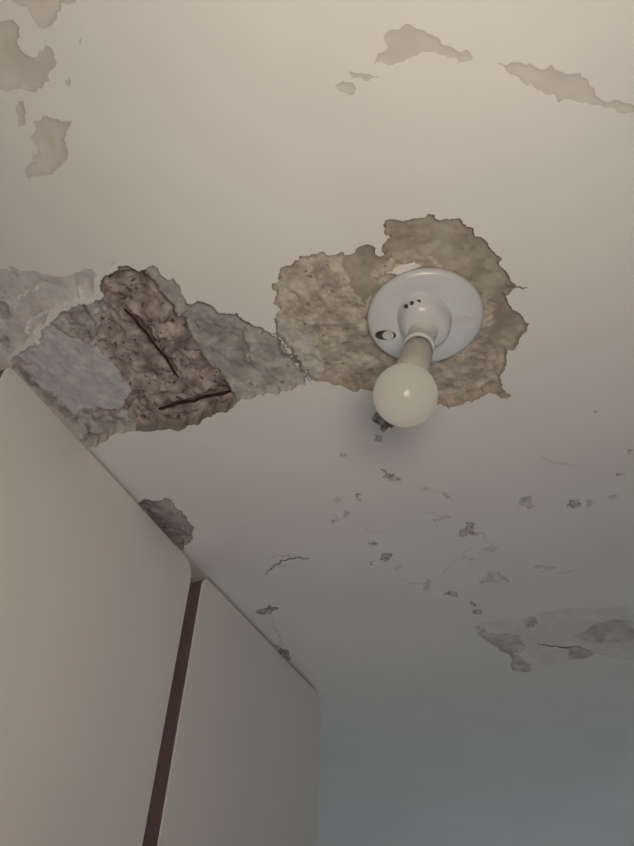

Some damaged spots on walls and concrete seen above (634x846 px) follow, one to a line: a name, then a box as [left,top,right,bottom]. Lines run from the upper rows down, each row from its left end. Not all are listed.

peeling [10,0,76,29]
peeling [0,20,57,93]
peeling [373,24,473,65]
peeling [335,71,378,95]
peeling [498,62,634,114]
peeling [15,101,71,183]
spalling [0,214,529,448]
flaking render [138,498,195,550]
crack [265,554,309,575]
peeling [469,601,634,673]